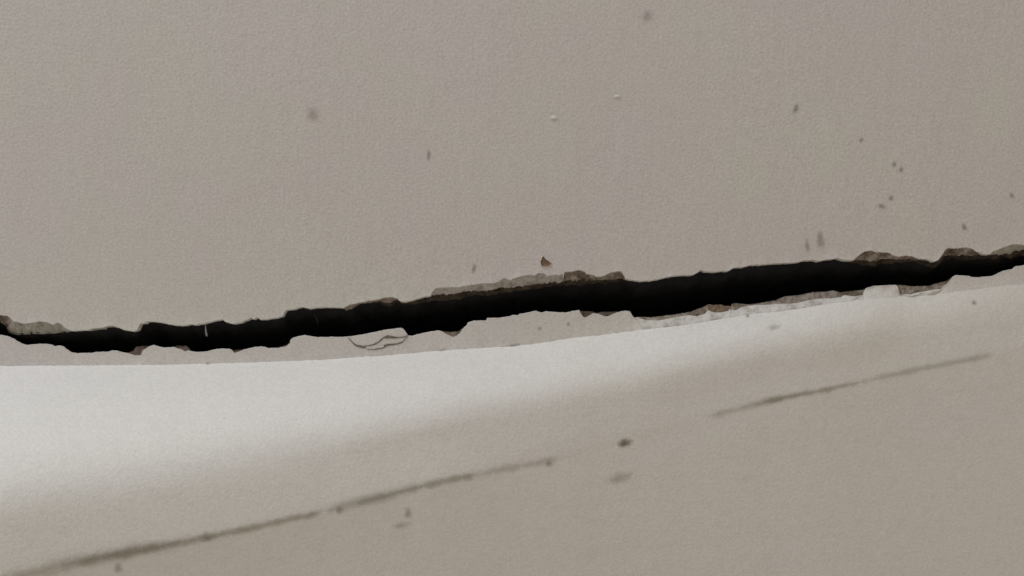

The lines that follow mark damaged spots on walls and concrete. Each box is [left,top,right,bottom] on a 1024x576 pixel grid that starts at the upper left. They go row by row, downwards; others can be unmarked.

crack [0,245,1024,366]